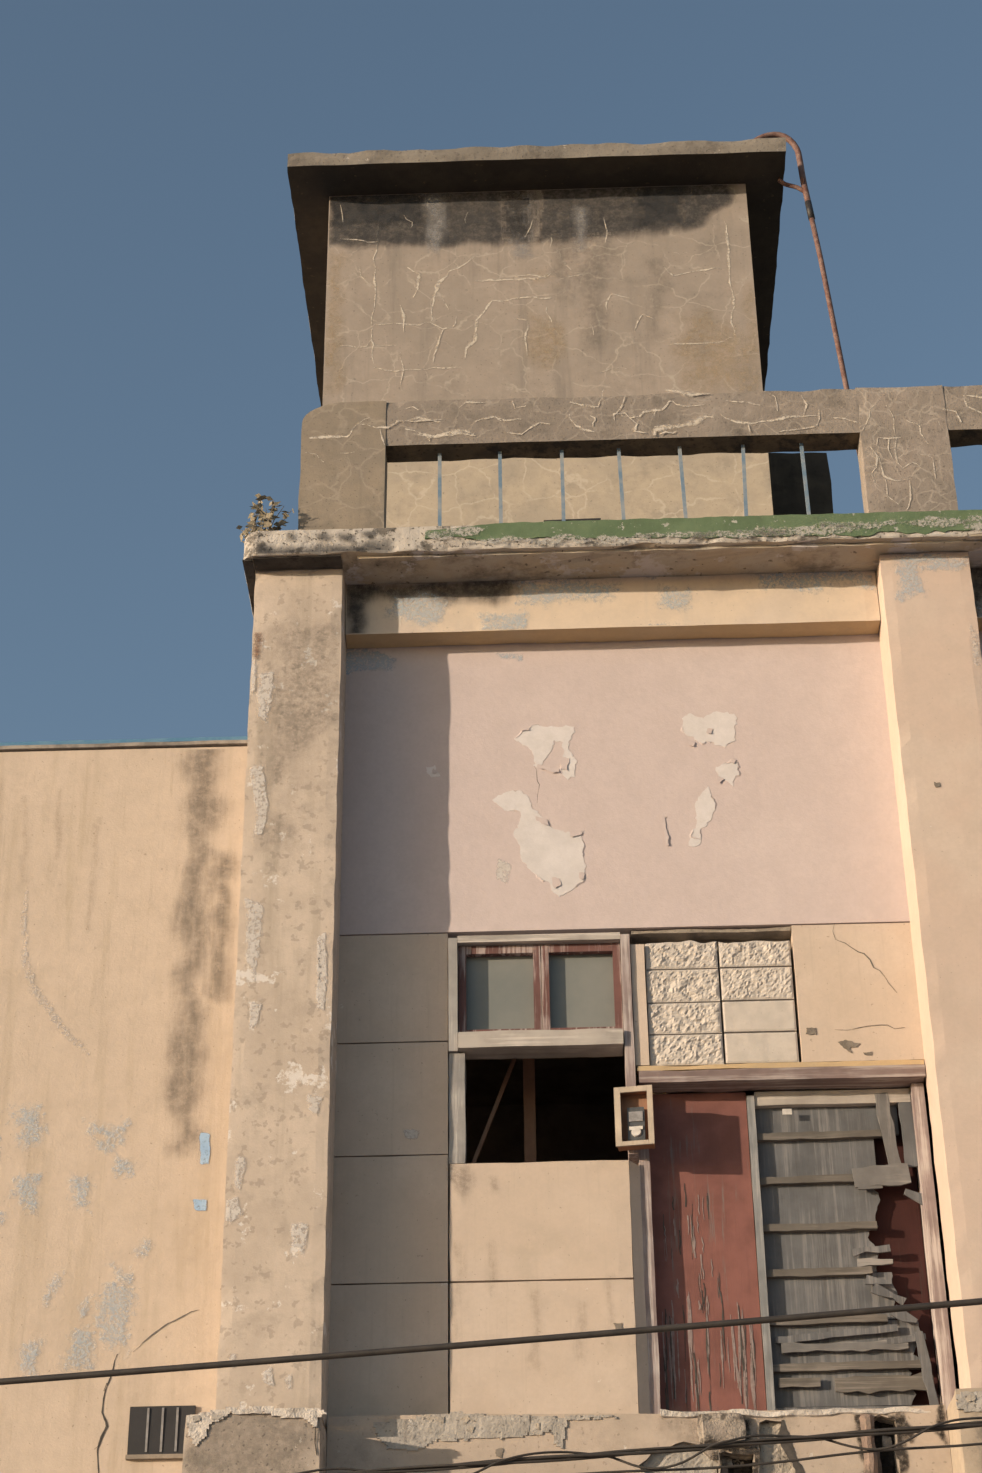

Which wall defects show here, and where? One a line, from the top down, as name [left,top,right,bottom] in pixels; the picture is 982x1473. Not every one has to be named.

leakage [329,185,731,255]
crack [305,205,982,509]
leakage [970,568,982,615]
peeling [514,724,577,780]
peeling [681,711,741,847]
peeling [493,790,586,897]
crack [833,927,895,990]
peeling [199,1133,210,1165]
peeling [193,1199,207,1211]
peeling [640,1183,795,1473]
spalling [373,1411,617,1458]
spalling [874,1421,896,1473]